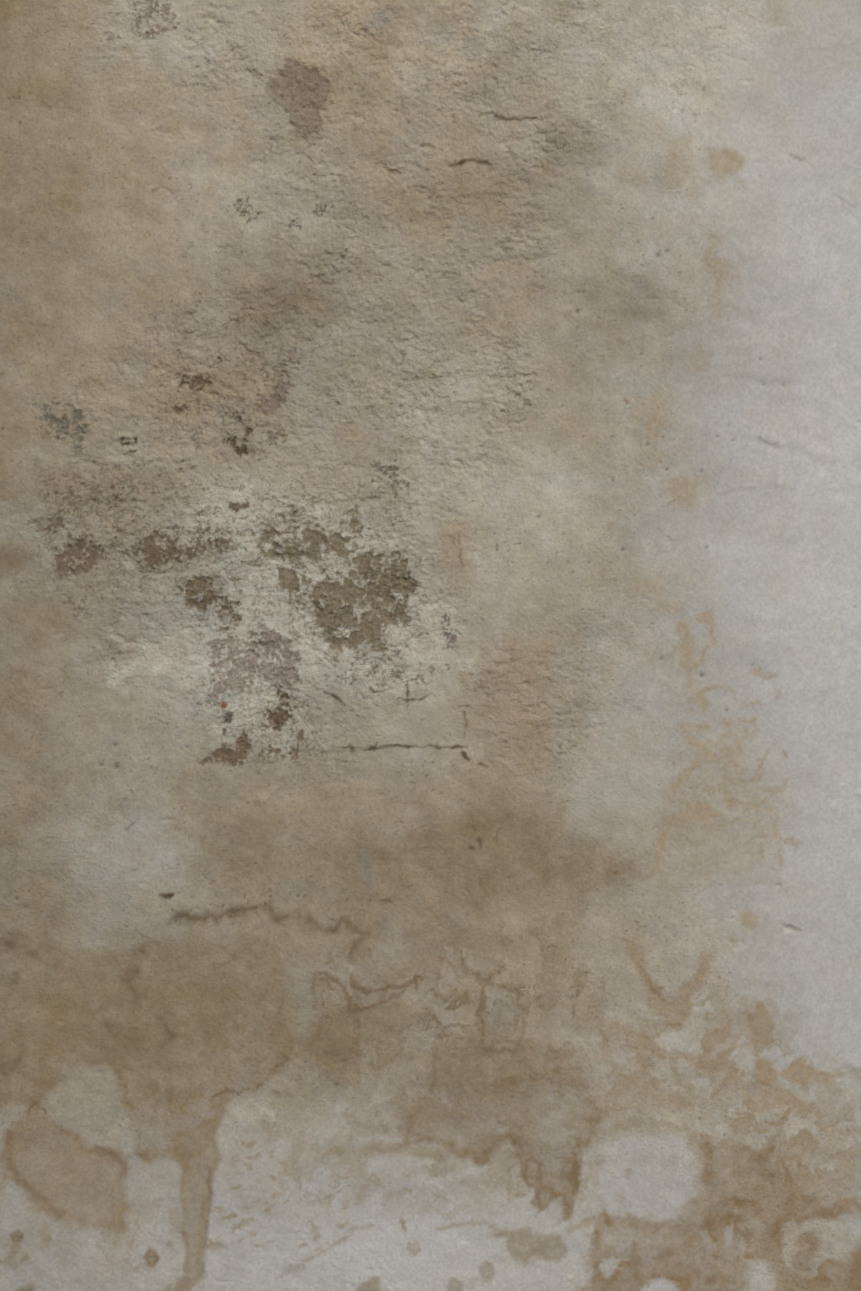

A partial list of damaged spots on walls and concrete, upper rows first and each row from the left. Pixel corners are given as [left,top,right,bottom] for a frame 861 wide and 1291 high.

leakage [85,0,197,55]
leakage [616,129,749,204]
leakage [699,228,742,325]
leakage [269,345,329,421]
leakage [622,383,712,512]
spalling [18,275,466,786]
leakage [0,453,861,1291]